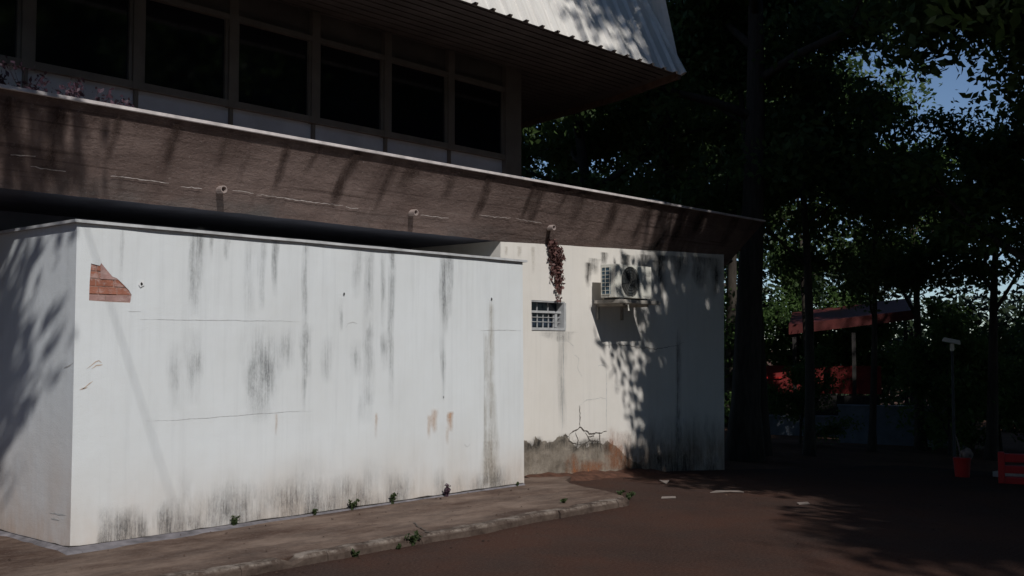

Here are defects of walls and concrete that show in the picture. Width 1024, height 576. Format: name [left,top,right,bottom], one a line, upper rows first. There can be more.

spalling [89,263,144,303]
crack [562,337,680,450]
peeling [524,431,642,476]